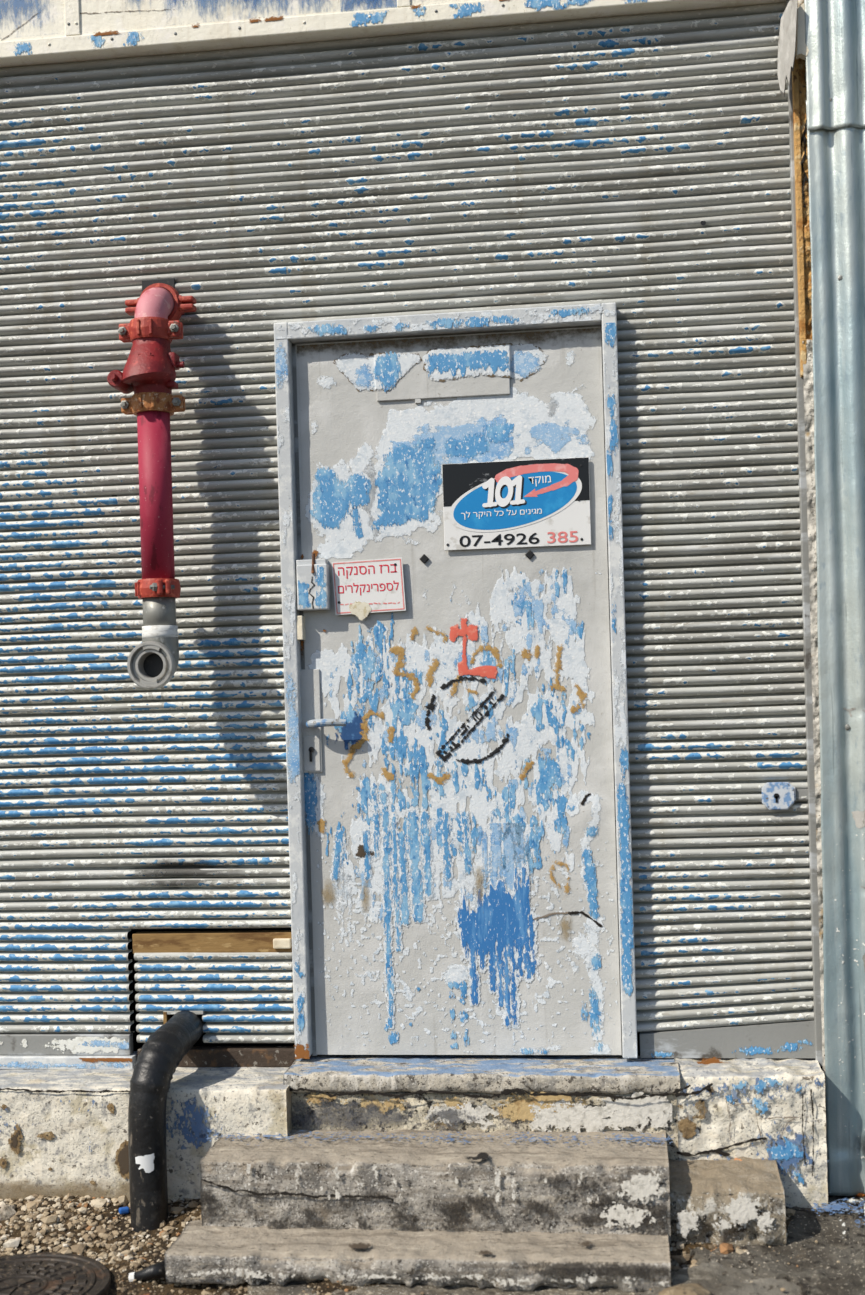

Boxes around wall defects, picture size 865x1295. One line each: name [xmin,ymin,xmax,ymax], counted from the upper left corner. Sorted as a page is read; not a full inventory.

spalling [524,0,591,11]
peeling [0,2,823,1069]
peeling [166,1096,222,1150]
crack [289,1083,814,1176]
spalling [306,1039,829,1184]
spalling [115,1140,129,1179]
crack [201,1179,394,1201]